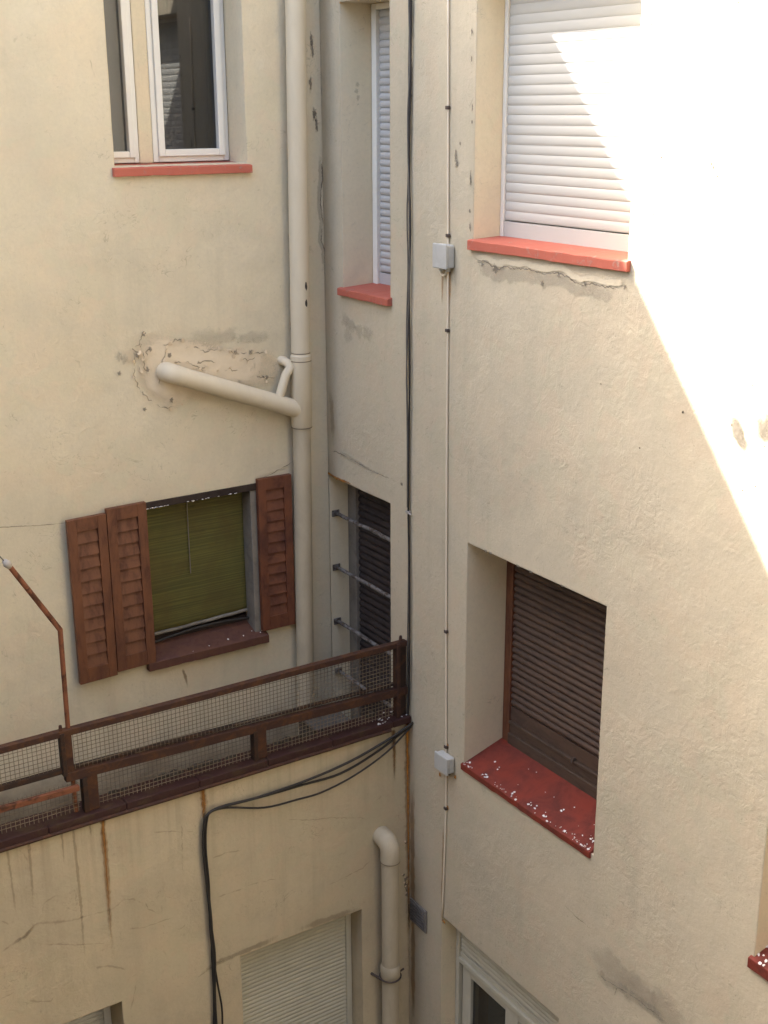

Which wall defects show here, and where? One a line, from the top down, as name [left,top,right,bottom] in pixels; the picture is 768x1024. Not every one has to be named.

flaking render [117,328,281,414]